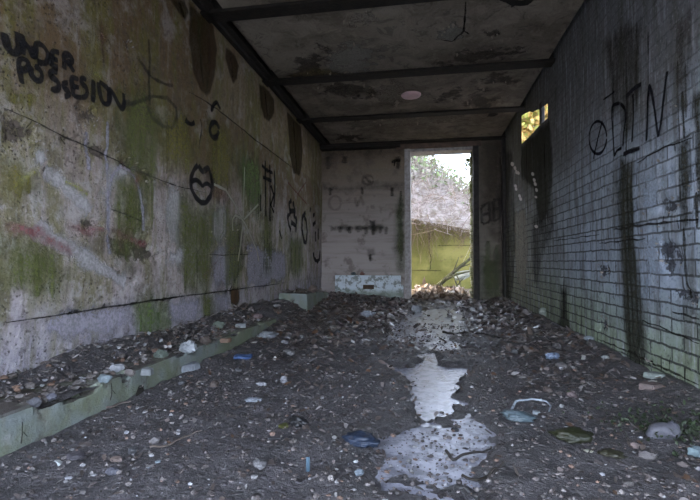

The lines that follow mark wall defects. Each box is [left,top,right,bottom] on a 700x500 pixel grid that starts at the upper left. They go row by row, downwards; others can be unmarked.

crack [444,2,469,42]
leakage [225,48,238,82]
leakage [259,85,274,121]
leakage [112,88,194,261]
leakage [287,112,302,175]
leakage [177,119,273,317]
leakage [483,120,553,299]
leakage [616,160,644,366]
crack [6,283,280,323]